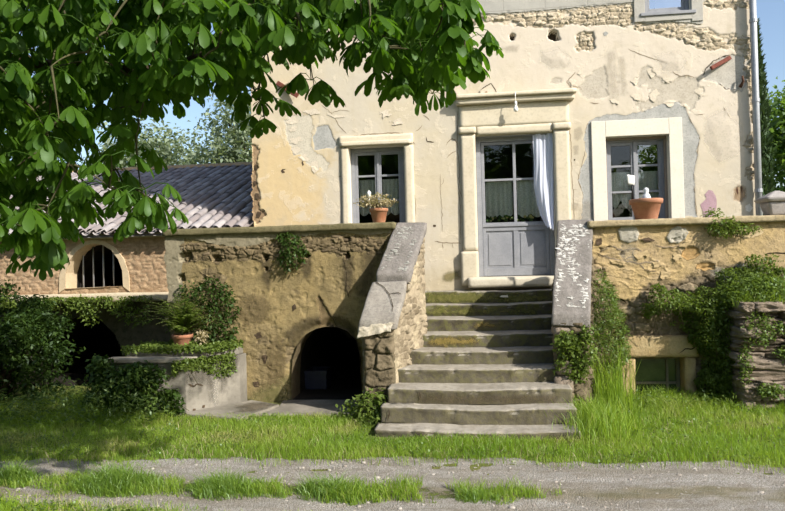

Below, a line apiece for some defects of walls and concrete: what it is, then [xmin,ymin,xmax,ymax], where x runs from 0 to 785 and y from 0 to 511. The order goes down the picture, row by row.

flaking render [703,0,749,10]
flaking render [472,4,754,153]
flaking render [283,108,345,173]
spalling [251,144,267,224]
flaking render [633,237,715,279]